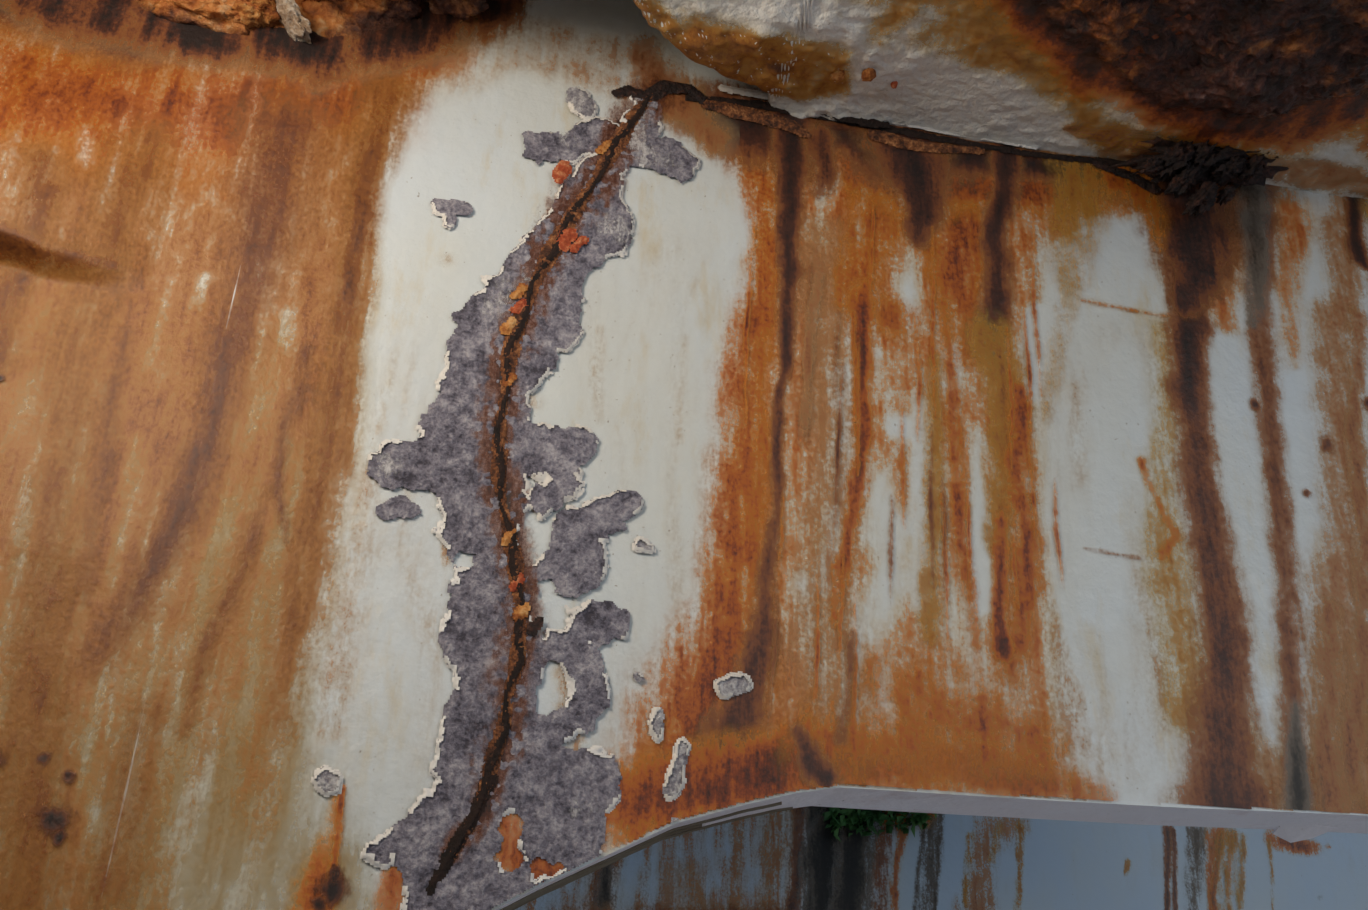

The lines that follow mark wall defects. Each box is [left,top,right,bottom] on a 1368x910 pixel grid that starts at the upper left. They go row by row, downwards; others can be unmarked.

rust [0,0,488,910]
spalling [0,0,527,93]
peeling [360,87,701,910]
rust [493,814,570,885]
peeling [713,671,753,700]
crack [426,75,1161,910]
rust [518,0,1368,910]
spalling [975,0,1368,157]